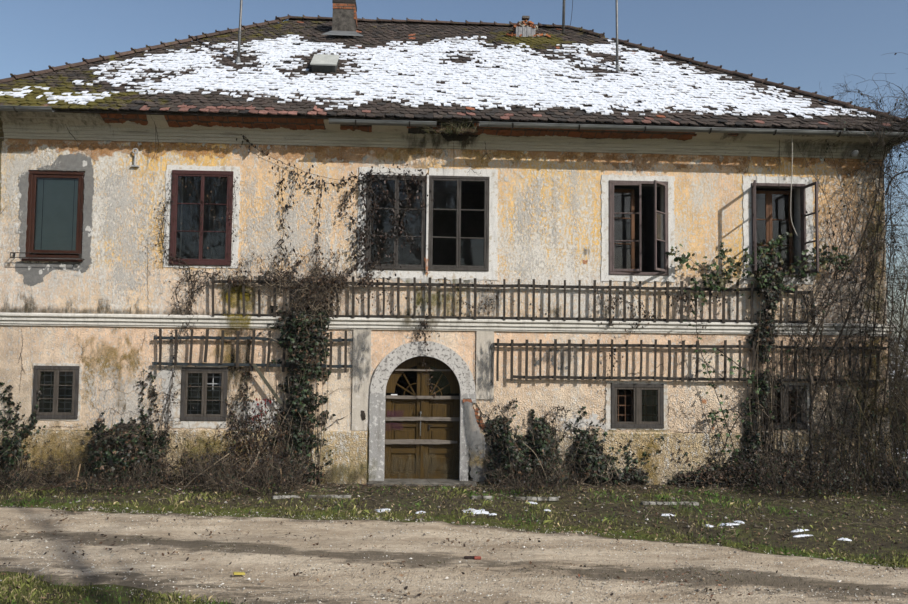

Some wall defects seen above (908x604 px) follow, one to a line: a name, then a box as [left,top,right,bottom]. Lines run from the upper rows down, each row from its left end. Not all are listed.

flaking render [100,113,148,125]
flaking render [164,115,326,131]
flaking render [340,124,372,132]
flaking render [379,122,697,169]
peeling [0,141,238,307]
peeling [501,152,781,292]
flaking render [463,398,488,430]